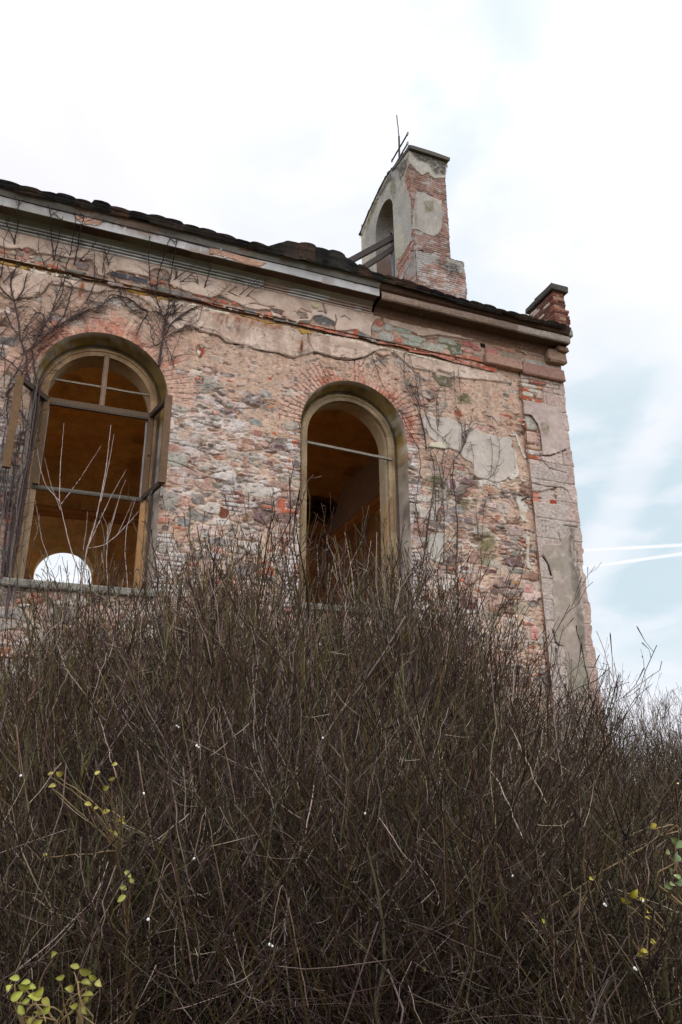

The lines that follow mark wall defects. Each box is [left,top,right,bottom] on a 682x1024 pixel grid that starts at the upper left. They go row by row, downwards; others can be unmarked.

peeling [395,150,448,279]
spalling [0,246,545,387]
crack [195,330,381,381]
peeling [422,379,568,484]
spalling [262,496,338,525]
spalling [516,488,557,522]
peeling [427,529,446,564]